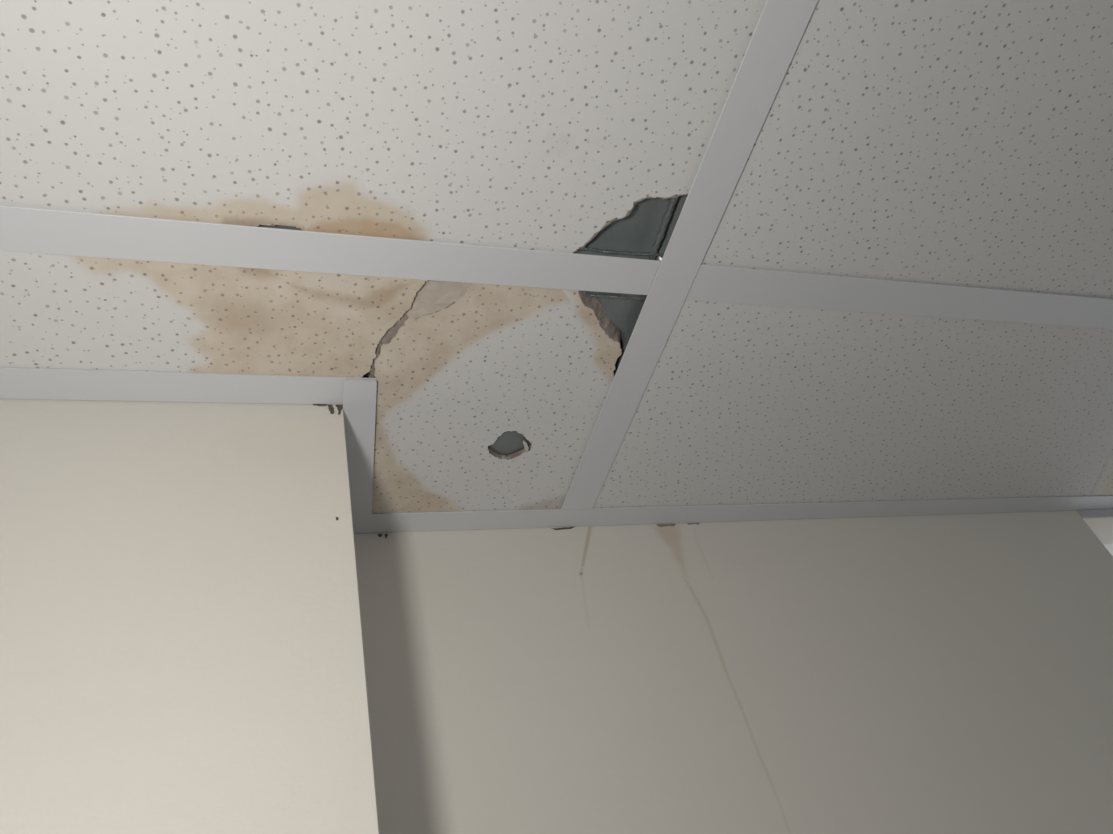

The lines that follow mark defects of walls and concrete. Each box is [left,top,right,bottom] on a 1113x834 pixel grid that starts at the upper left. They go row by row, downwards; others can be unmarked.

damp [87,175,439,242]
spalling [578,291,621,348]
damp [62,255,622,513]